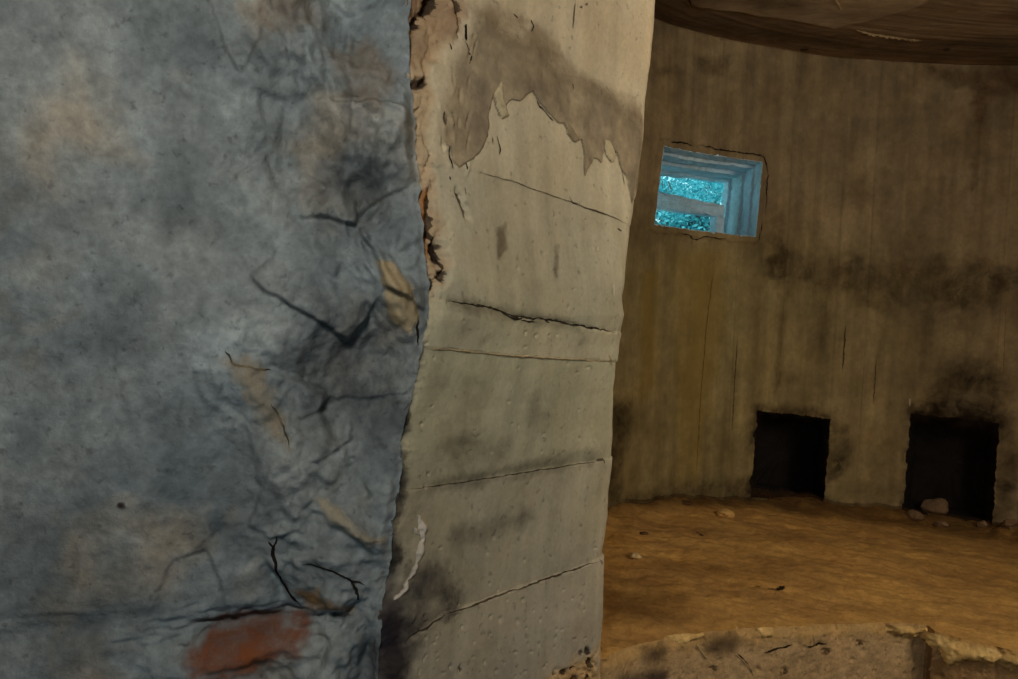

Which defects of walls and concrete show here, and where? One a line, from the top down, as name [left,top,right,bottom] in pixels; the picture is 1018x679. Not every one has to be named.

peeling [445,26,643,203]
crack [452,301,614,333]
crack [268,537,303,607]
crack [302,564,364,600]
spalling [553,648,593,679]